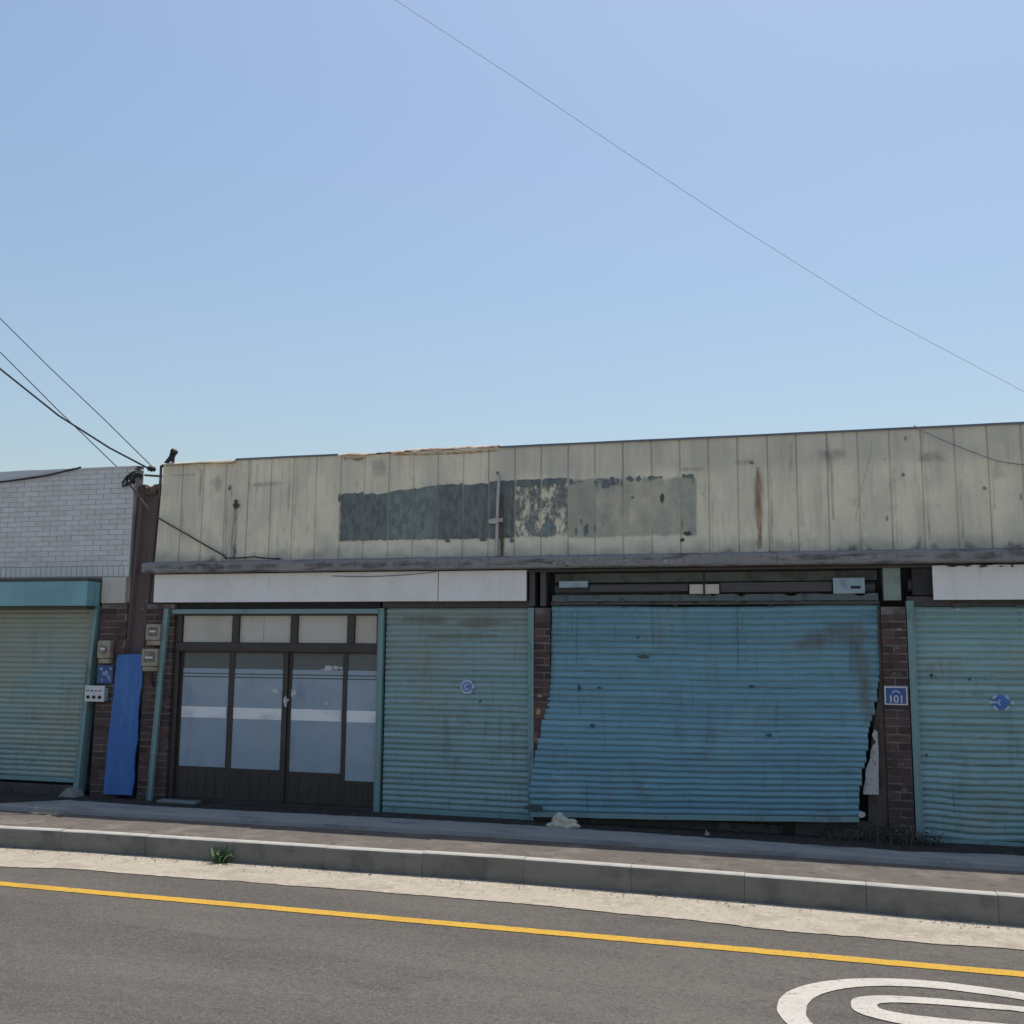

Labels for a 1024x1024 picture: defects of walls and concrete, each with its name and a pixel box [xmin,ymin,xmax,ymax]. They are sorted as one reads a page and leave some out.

peeling [338,474,696,543]
corrosion [750,461,760,548]
peeling [863,730,879,795]